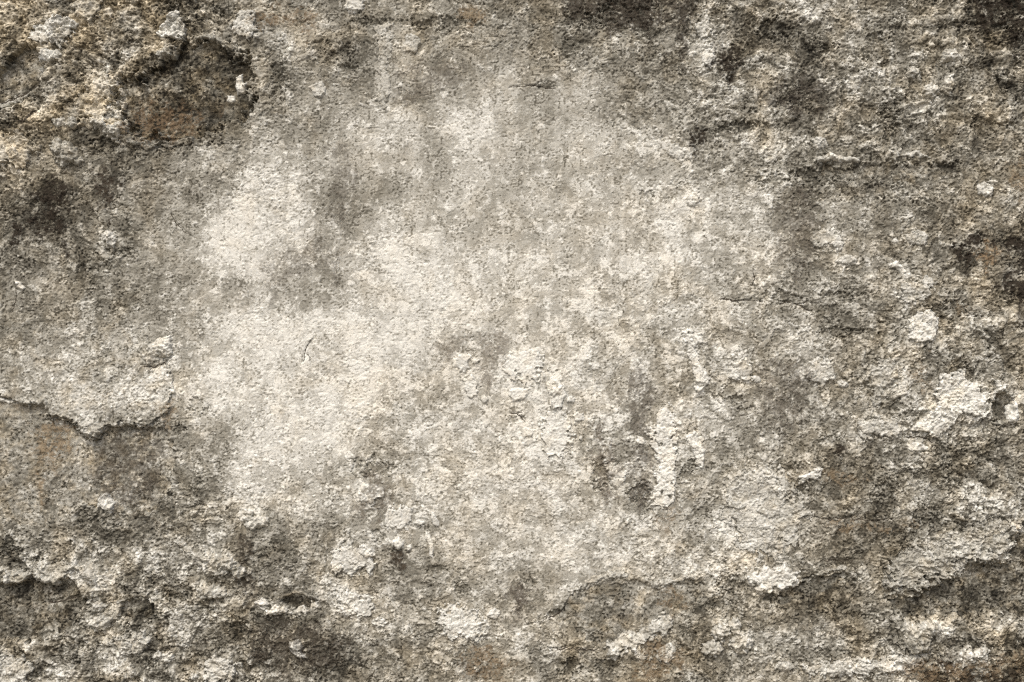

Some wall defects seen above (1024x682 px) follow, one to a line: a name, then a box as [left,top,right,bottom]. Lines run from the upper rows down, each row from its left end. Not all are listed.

spalling [0,319,179,527]
spalling [0,559,98,682]
spalling [114,593,162,660]
flaking render [189,654,243,682]
spalling [276,589,316,608]
flaking render [288,639,306,659]
flaking render [330,543,388,627]